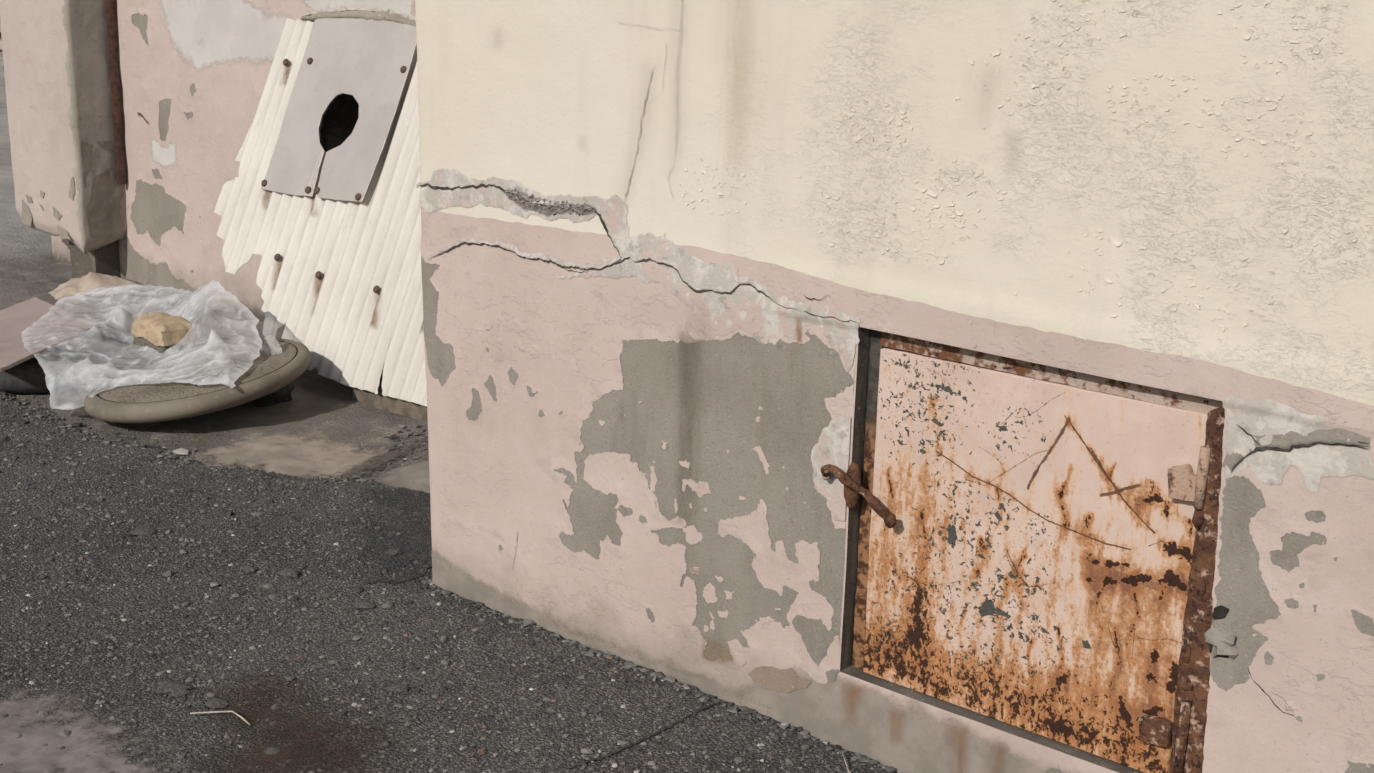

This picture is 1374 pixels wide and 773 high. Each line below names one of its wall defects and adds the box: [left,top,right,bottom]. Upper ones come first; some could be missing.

peeling [127,5,154,55]
crack [416,70,854,322]
peeling [420,236,549,426]
peeling [543,322,856,693]
peeling [1205,461,1352,709]
crack [1222,424,1370,472]
peeling [1343,603,1374,643]